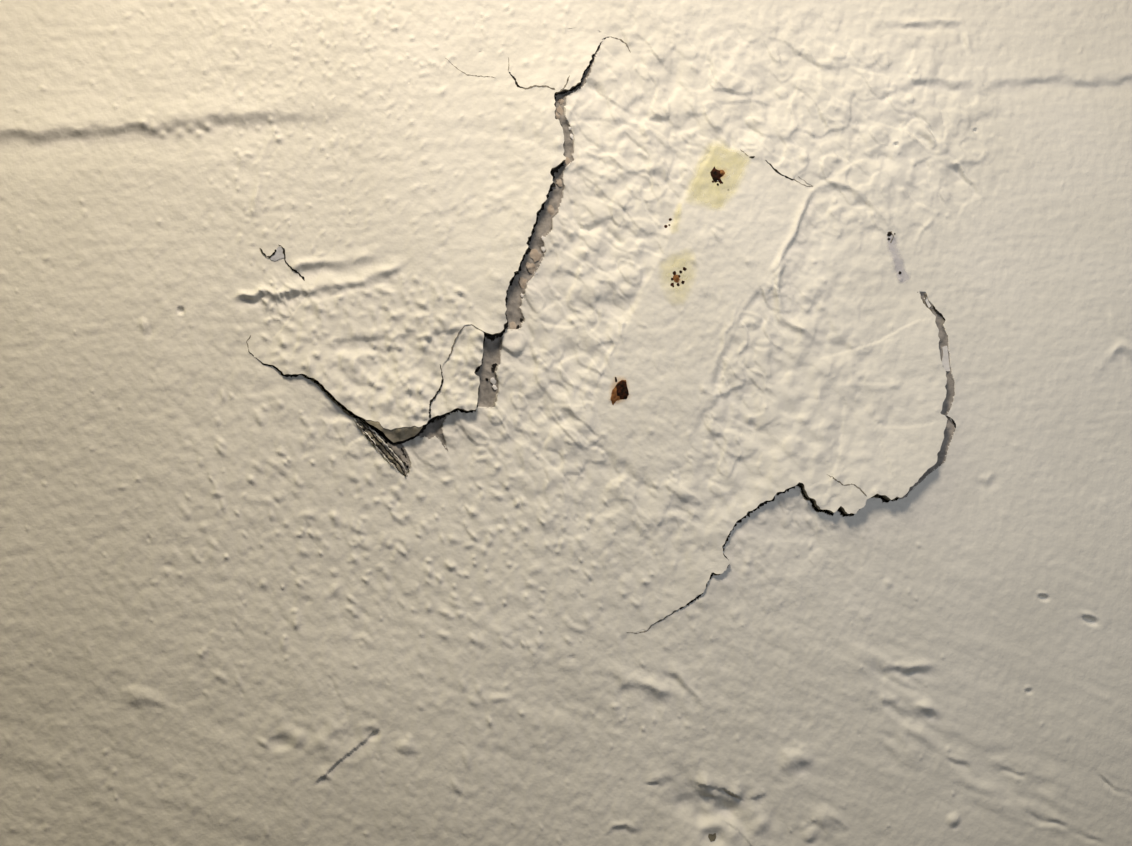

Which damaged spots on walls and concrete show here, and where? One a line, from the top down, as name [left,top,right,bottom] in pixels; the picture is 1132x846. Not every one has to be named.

corrosion [696,157,743,204]
crack [740,149,813,187]
crack [246,37,631,477]
corrosion [610,377,629,405]
crack [626,292,956,634]